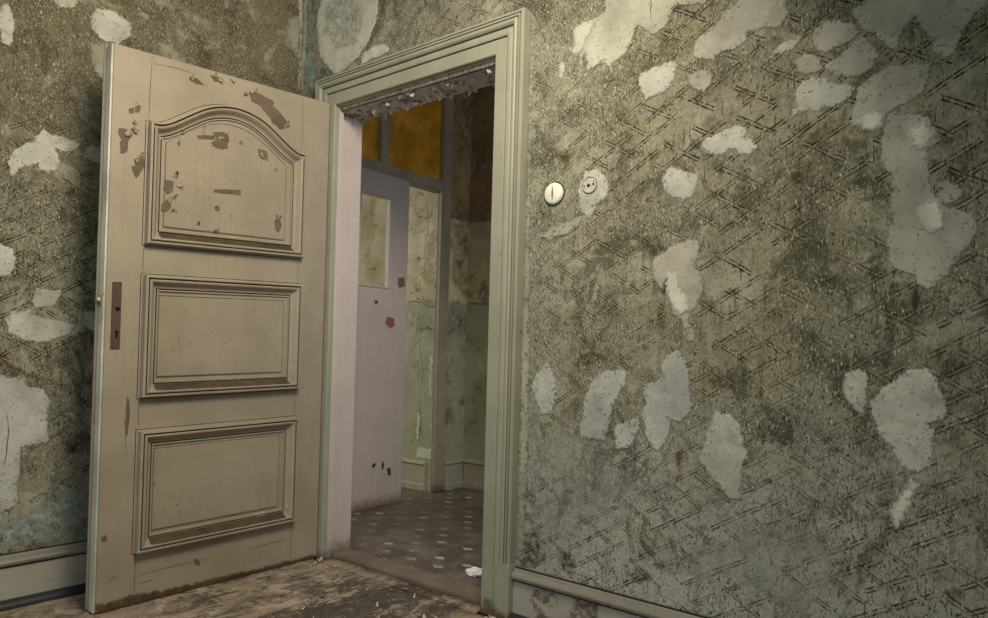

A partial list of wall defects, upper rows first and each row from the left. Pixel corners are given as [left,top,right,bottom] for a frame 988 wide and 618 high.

flaking render [316,0,389,74]
flaking render [572,0,706,71]
flaking render [638,60,678,100]
flaking render [687,0,788,93]
flaking render [8,130,101,177]
flaking render [772,0,988,307]
flaking render [5,288,95,343]
flaking render [652,240,705,342]
flaking render [0,375,51,513]
flaking render [579,349,693,451]
flaking render [698,410,749,500]
flaking render [843,368,948,529]